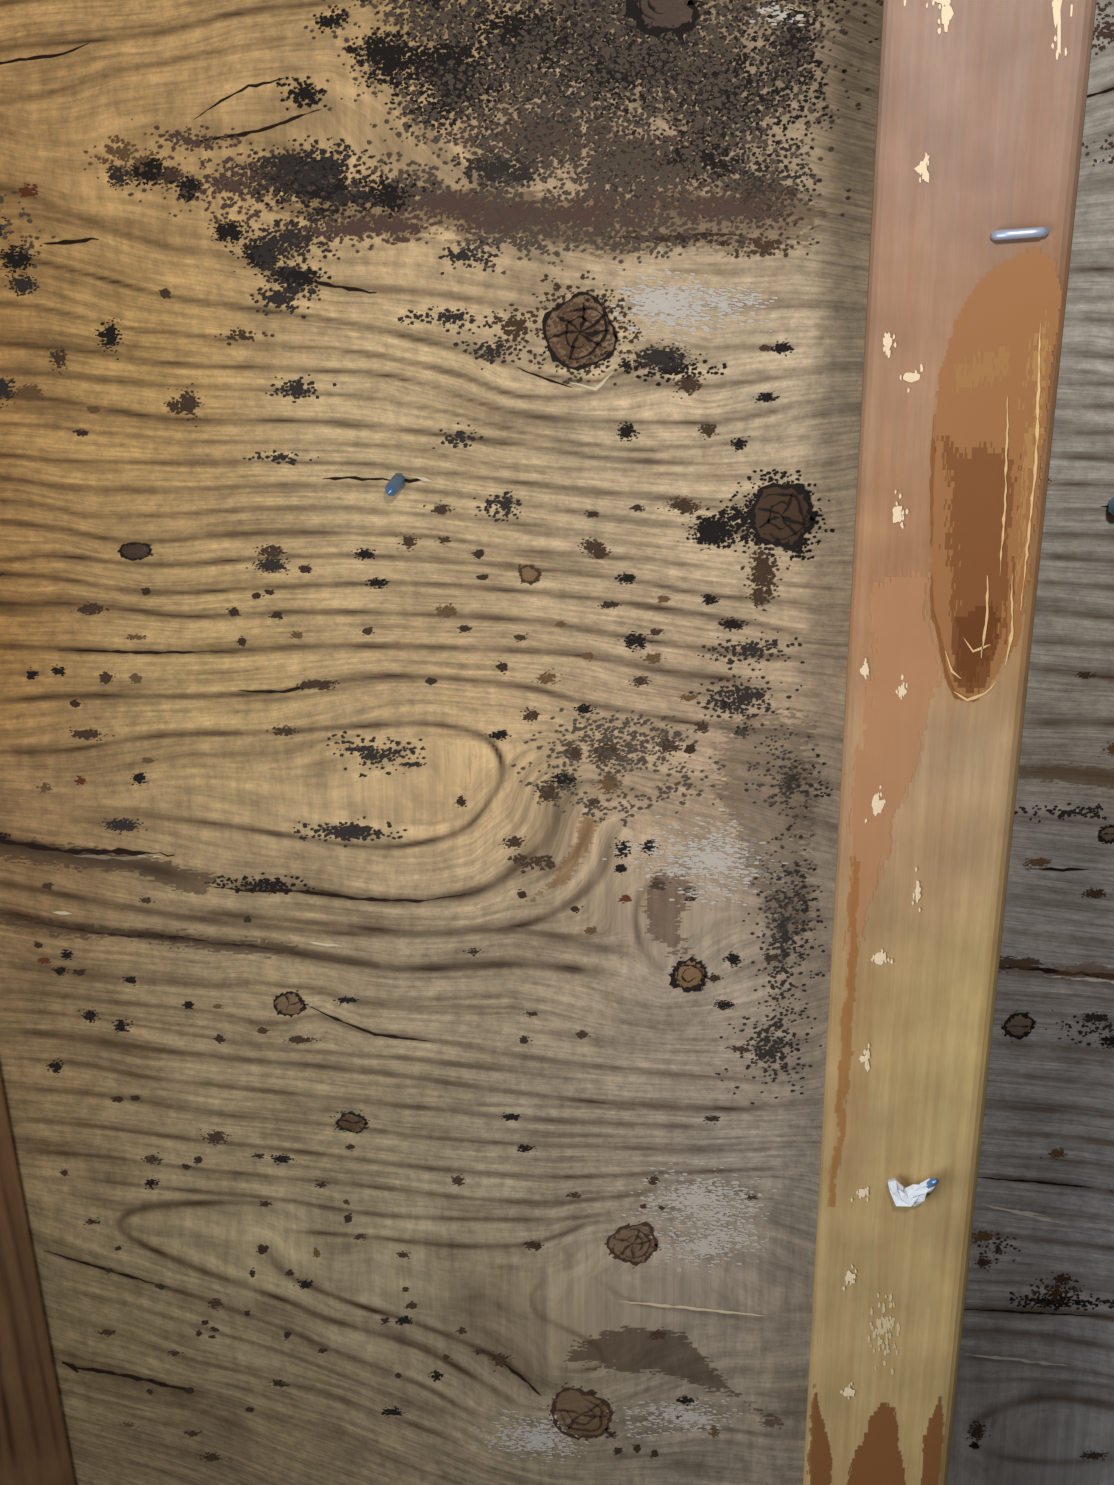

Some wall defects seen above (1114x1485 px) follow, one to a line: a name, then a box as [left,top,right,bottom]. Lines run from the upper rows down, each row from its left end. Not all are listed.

mould [1092,1,1114,55]
water stain [83,0,847,346]
mould [1082,134,1114,166]
water stain [531,668,562,684]
water stain [629,248,1061,1104]
water stain [488,729,511,742]
water stain [520,707,540,725]
mould [572,703,596,716]
water stain [532,737,633,806]
water stain [499,836,555,899]
water stain [610,837,661,875]
water stain [807,1384,943,1485]